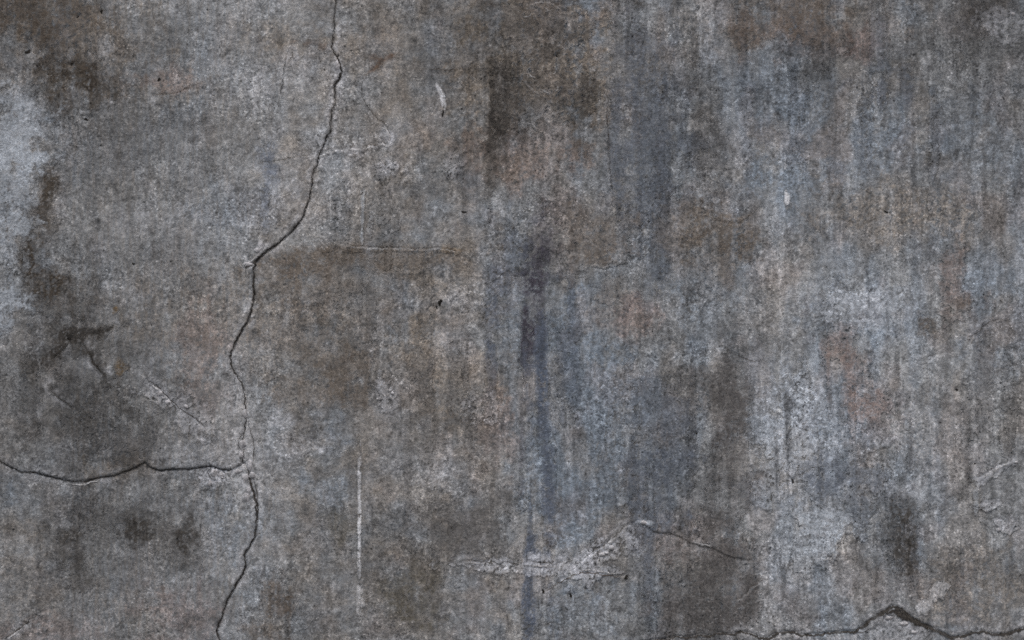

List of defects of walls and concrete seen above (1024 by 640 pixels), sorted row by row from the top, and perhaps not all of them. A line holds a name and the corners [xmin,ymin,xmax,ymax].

crack [0,4,390,640]
damp [234,0,775,640]
crack [656,605,1024,640]